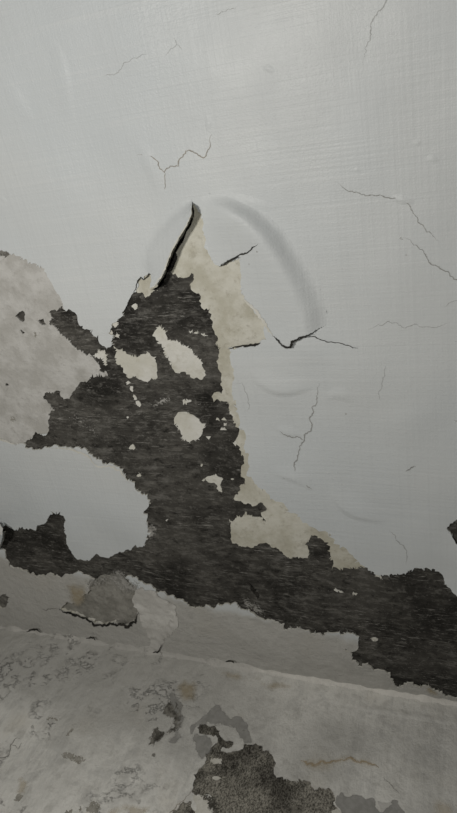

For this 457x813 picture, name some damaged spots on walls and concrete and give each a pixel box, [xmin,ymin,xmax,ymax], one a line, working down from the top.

spalling [0,193,457,697]
crack [281,387,318,479]
peeling [192,794,213,813]